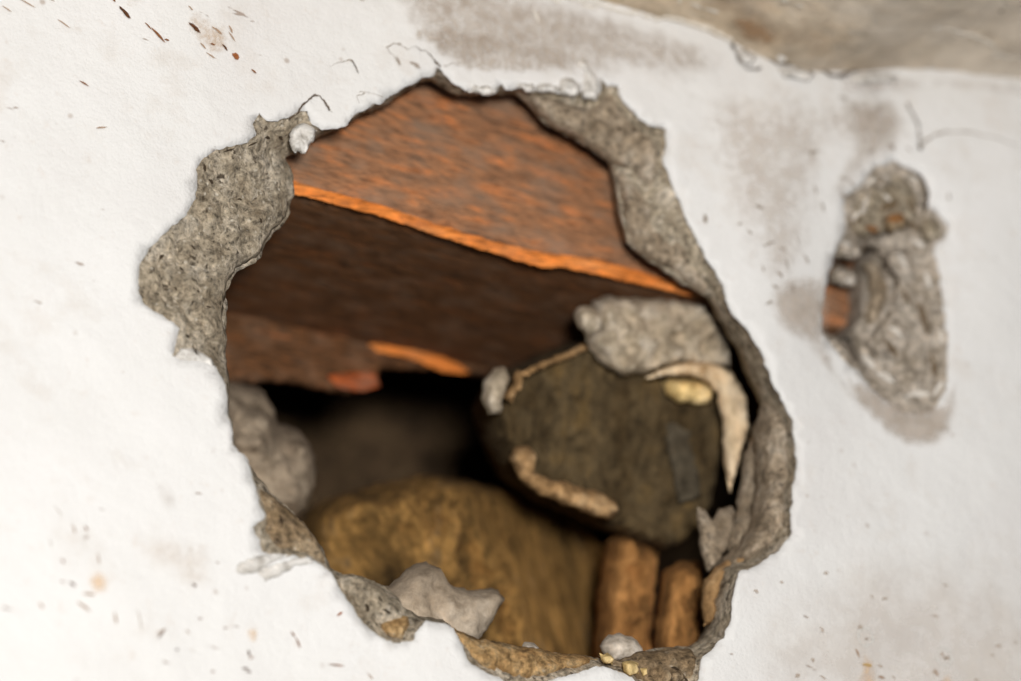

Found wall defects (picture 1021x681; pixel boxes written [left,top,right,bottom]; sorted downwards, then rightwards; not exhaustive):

leakage [419,0,633,69]
crack [900,103,1015,211]
leakage [764,218,821,336]
spalling [823,161,948,415]
spalling [138,60,796,681]
leakage [856,387,950,441]